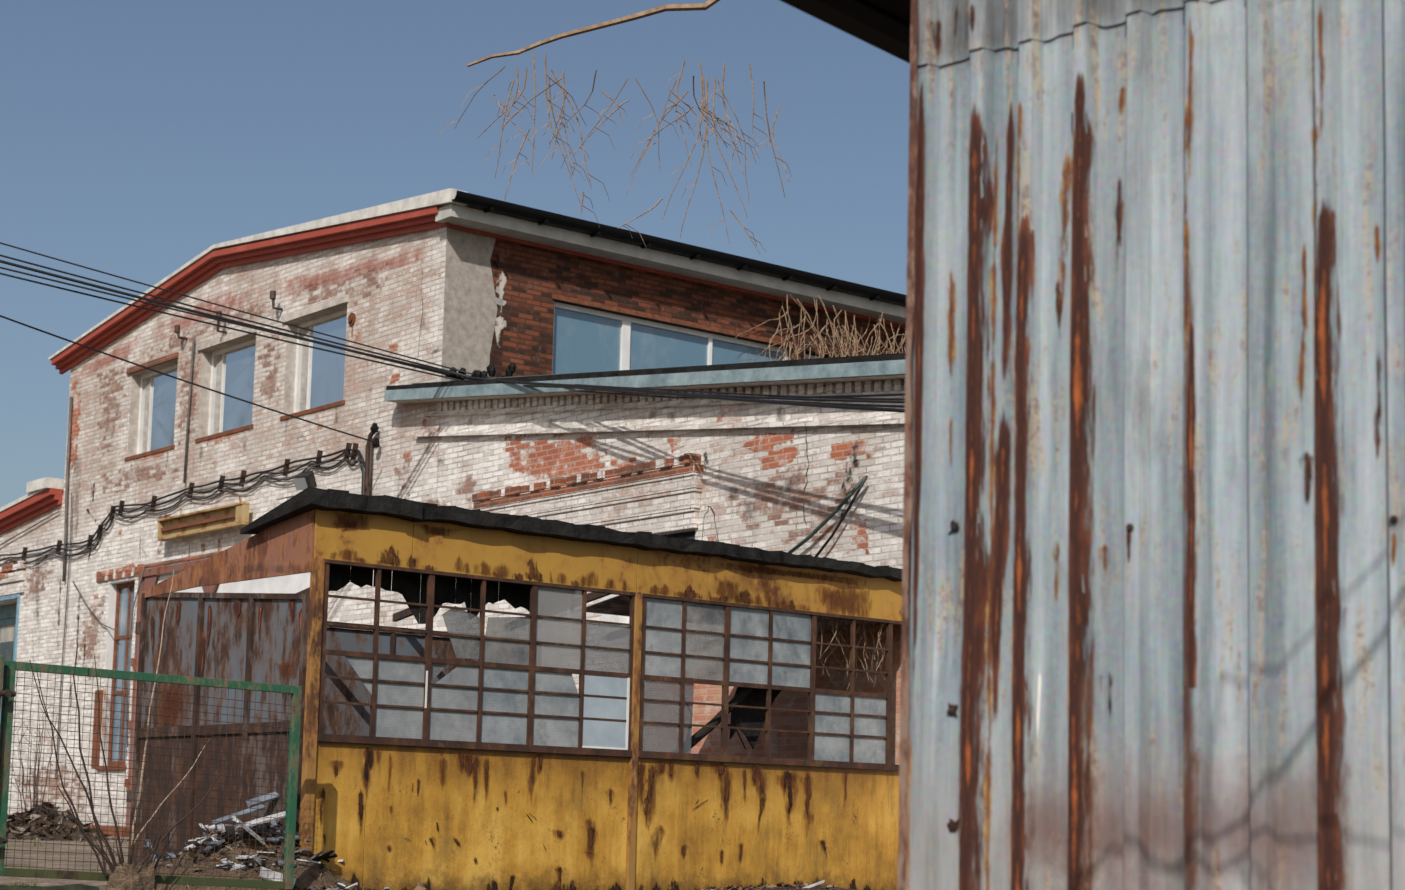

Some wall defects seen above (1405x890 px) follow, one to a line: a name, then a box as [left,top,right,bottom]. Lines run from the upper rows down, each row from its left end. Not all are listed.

peeling [495,271,507,348]
flaking render [503,433,636,479]
flaking render [731,428,870,554]
corrosion [959,102,1035,890]
corrosion [1067,73,1111,890]
corrosion [1296,5,1346,890]
corrosion [457,558,627,590]
corrosion [358,748,391,826]
corrosion [440,752,506,810]
corrosion [586,819,595,859]
corrosion [638,762,674,856]
corrosion [695,763,813,829]